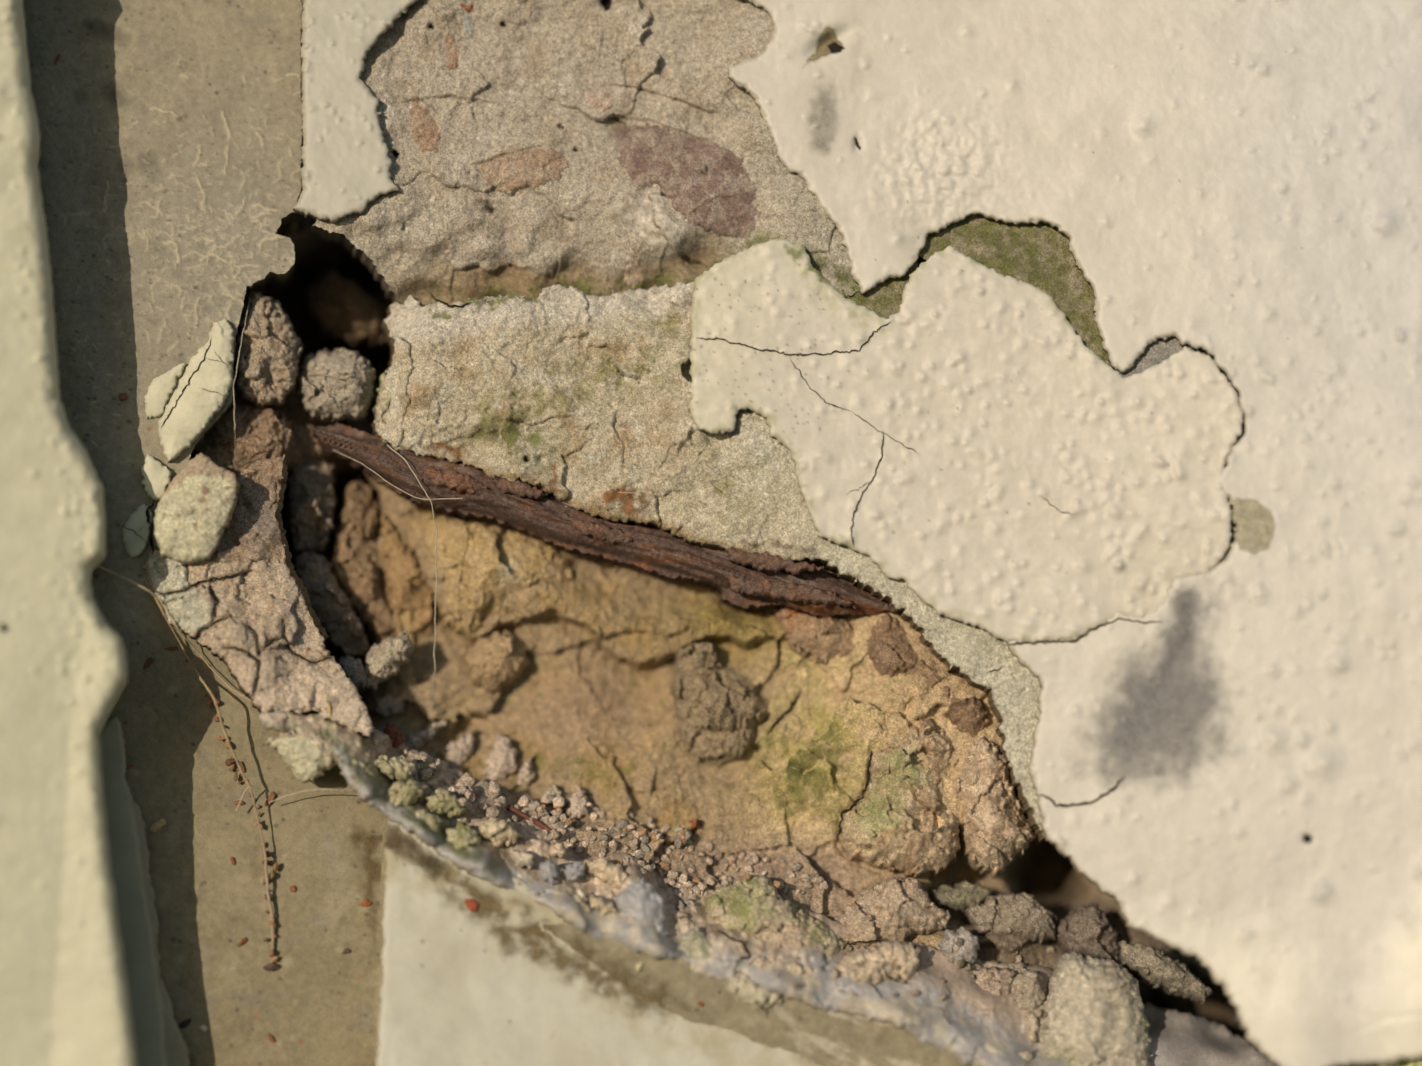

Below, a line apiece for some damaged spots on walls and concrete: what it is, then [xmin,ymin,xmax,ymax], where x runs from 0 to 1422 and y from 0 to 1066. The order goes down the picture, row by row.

crack [165,458,340,696]
corrosion [312,422,902,618]
spalling [122,0,1274,1049]
crack [700,322,918,545]
leakage [1105,595,1215,772]